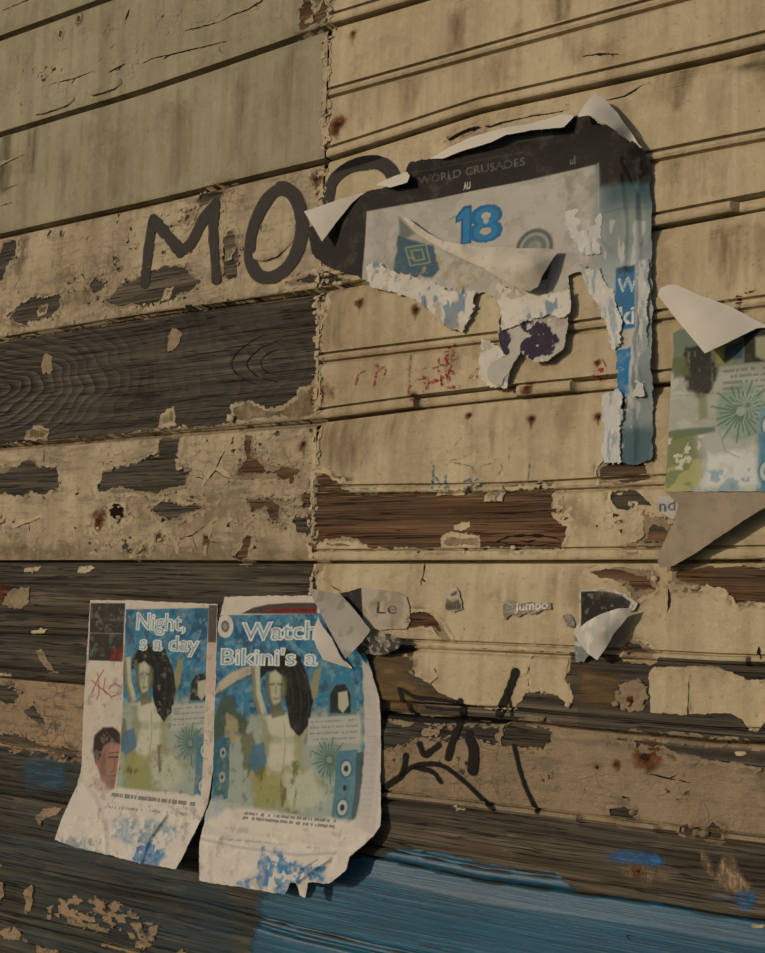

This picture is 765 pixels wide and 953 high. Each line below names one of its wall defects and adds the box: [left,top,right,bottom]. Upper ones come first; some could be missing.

crack [39,0,263,88]
peeling [292,0,336,41]
peeling [0,169,765,615]
peeling [397,608,572,695]
peeling [0,677,82,764]
peeling [380,711,565,809]
corrosion [634,743,661,771]
peeling [600,719,765,778]
peeling [605,803,641,826]
peeling [676,816,726,845]